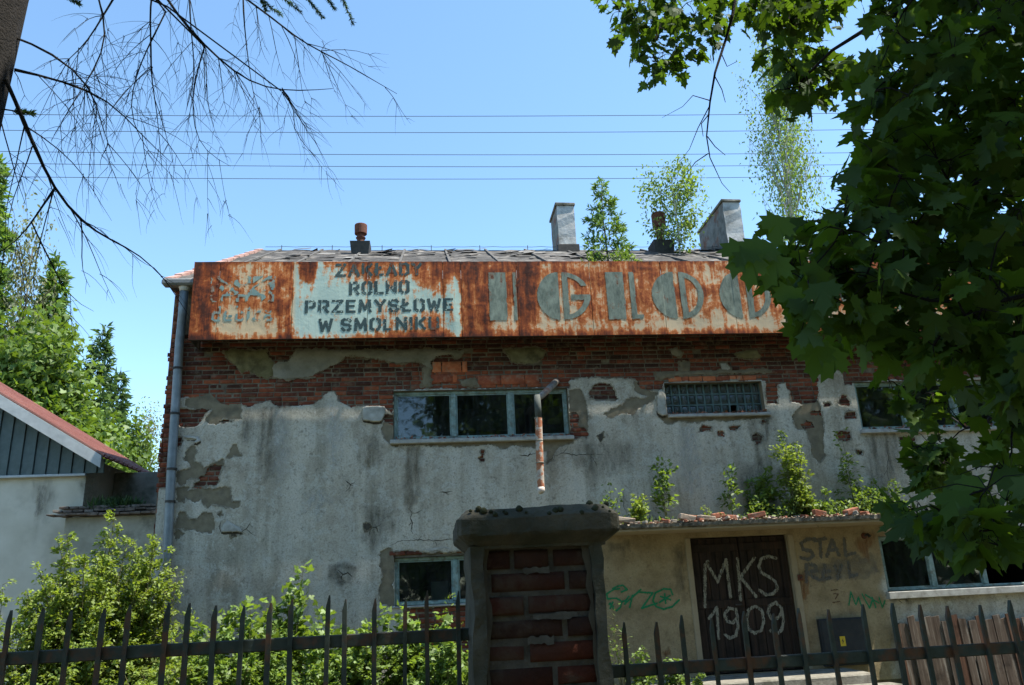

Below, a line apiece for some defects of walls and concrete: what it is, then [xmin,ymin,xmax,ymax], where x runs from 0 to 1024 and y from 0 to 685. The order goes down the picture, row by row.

spalling [46,331,878,541]